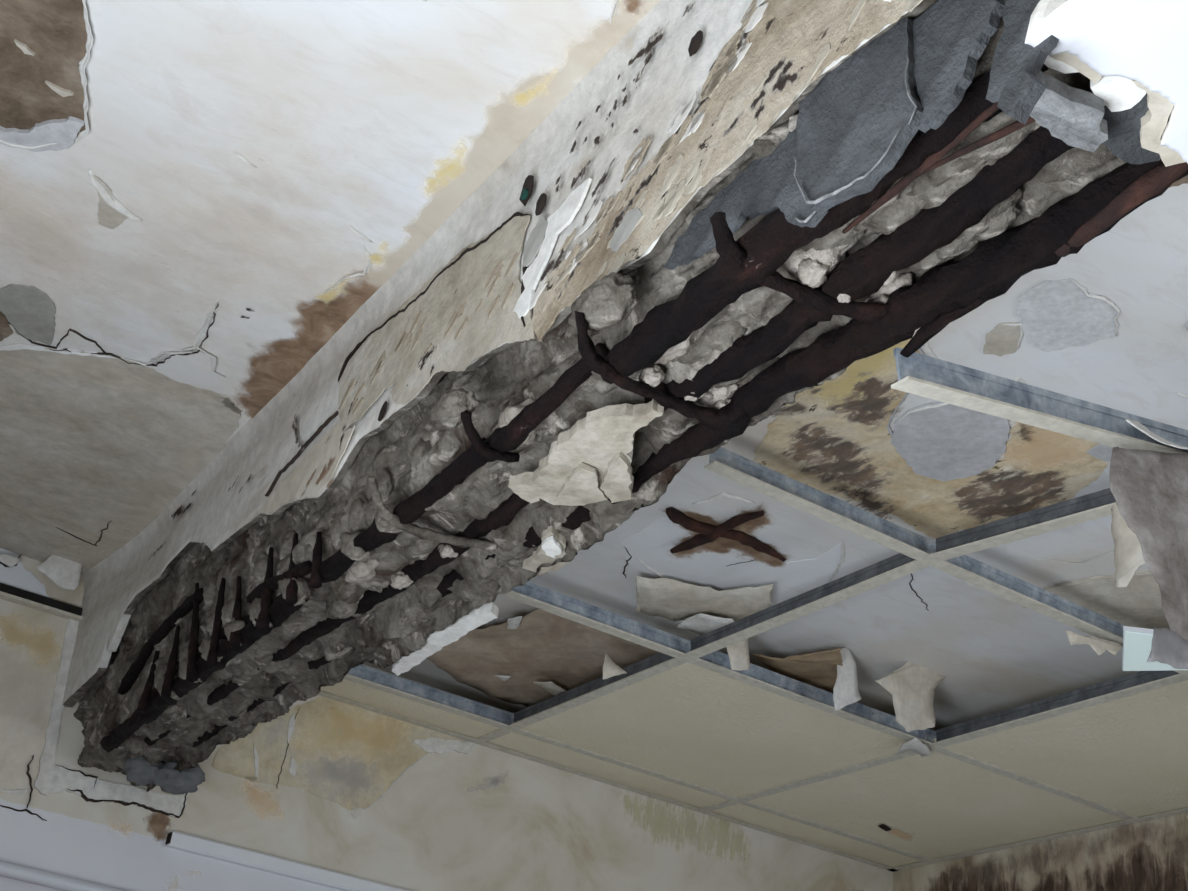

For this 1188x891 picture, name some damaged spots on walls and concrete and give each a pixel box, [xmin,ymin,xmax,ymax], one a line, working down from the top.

water stain [750,58,797,119]
water stain [235,0,669,419]
peeling [528,0,923,342]
crack [338,212,531,382]
peeling [338,178,592,429]
water stain [812,342,907,426]
crack [264,410,339,497]
rust [301,457,335,496]
peeling [752,386,1113,539]
rust [1002,425,1079,467]
peeling [620,492,842,591]
crack [0,755,188,821]